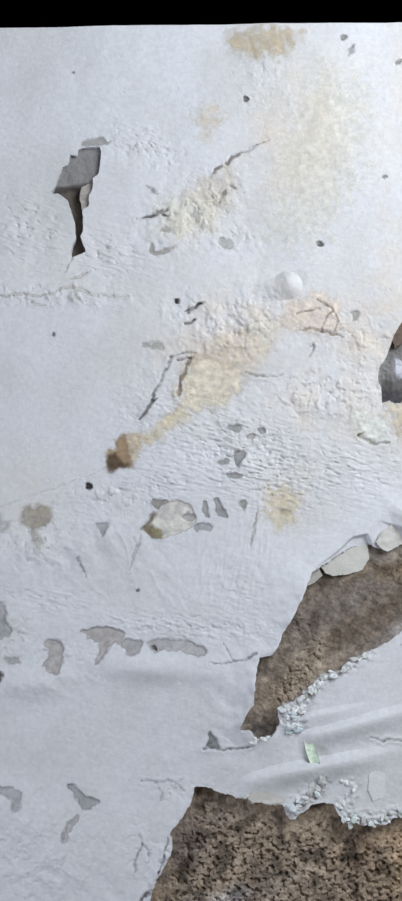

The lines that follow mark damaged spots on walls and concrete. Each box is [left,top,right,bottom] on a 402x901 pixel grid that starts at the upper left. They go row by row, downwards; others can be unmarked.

flaking render [53,137,107,258]
damp [282,291,341,334]
damp [144,319,273,445]
flaking render [378,323,402,404]
peeling [228,425,266,439]
peeling [218,450,246,478]
peeling [182,498,228,531]
peeling [81,626,206,665]
spalling [240,525,402,764]
peeling [207,731,219,748]
spalling [150,776,402,901]